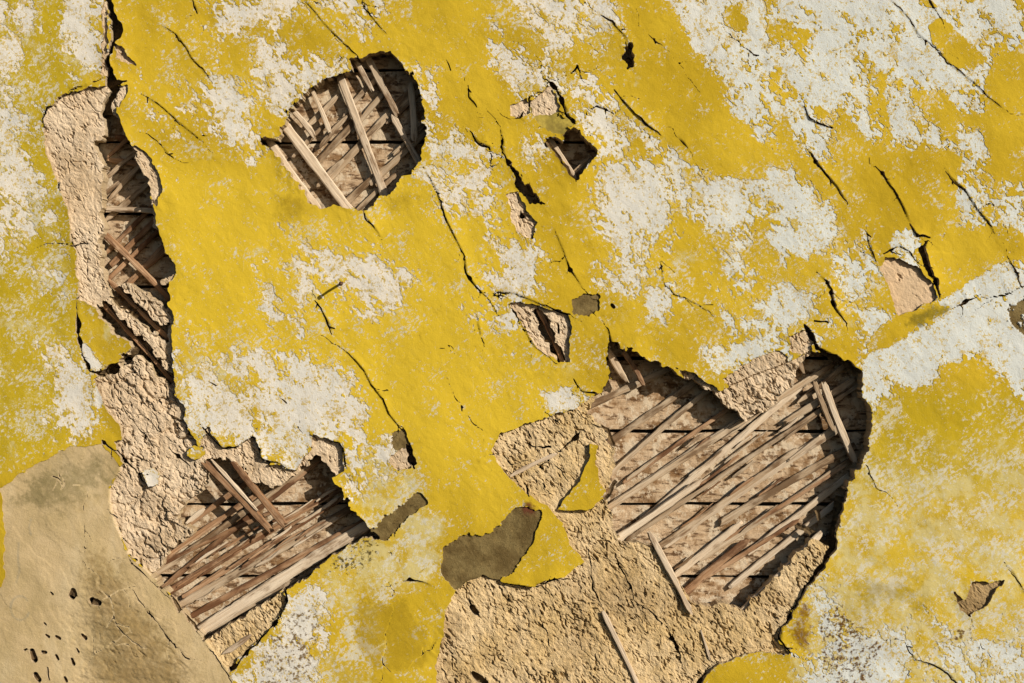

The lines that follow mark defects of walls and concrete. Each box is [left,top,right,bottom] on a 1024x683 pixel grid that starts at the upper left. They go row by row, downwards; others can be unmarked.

crack [55,0,217,163]
flaking render [0,0,428,683]
crack [312,291,407,439]
peeling [172,0,601,363]
crack [424,168,615,497]
flaking render [435,0,1024,683]
crack [803,248,863,375]
crack [799,102,1024,317]
crack [892,0,1008,112]